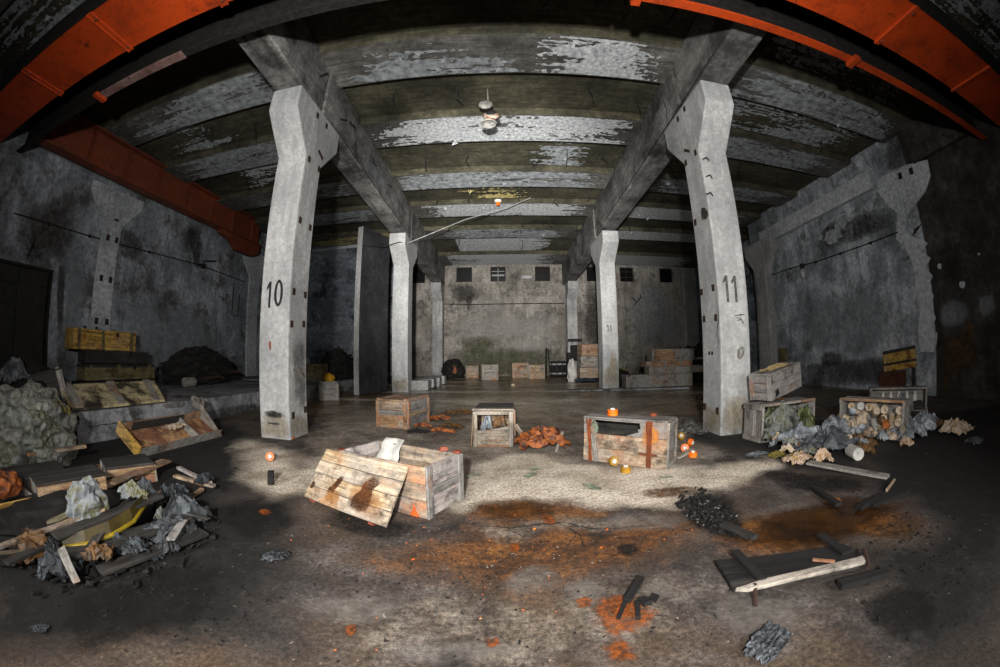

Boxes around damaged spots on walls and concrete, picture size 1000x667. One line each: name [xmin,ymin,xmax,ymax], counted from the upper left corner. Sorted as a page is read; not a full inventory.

peeling [346,35,663,82]
peeling [127,72,279,188]
peeling [372,116,633,217]
corrosion [484,500,555,524]
corrosion [646,487,692,497]
corrosion [577,596,653,660]